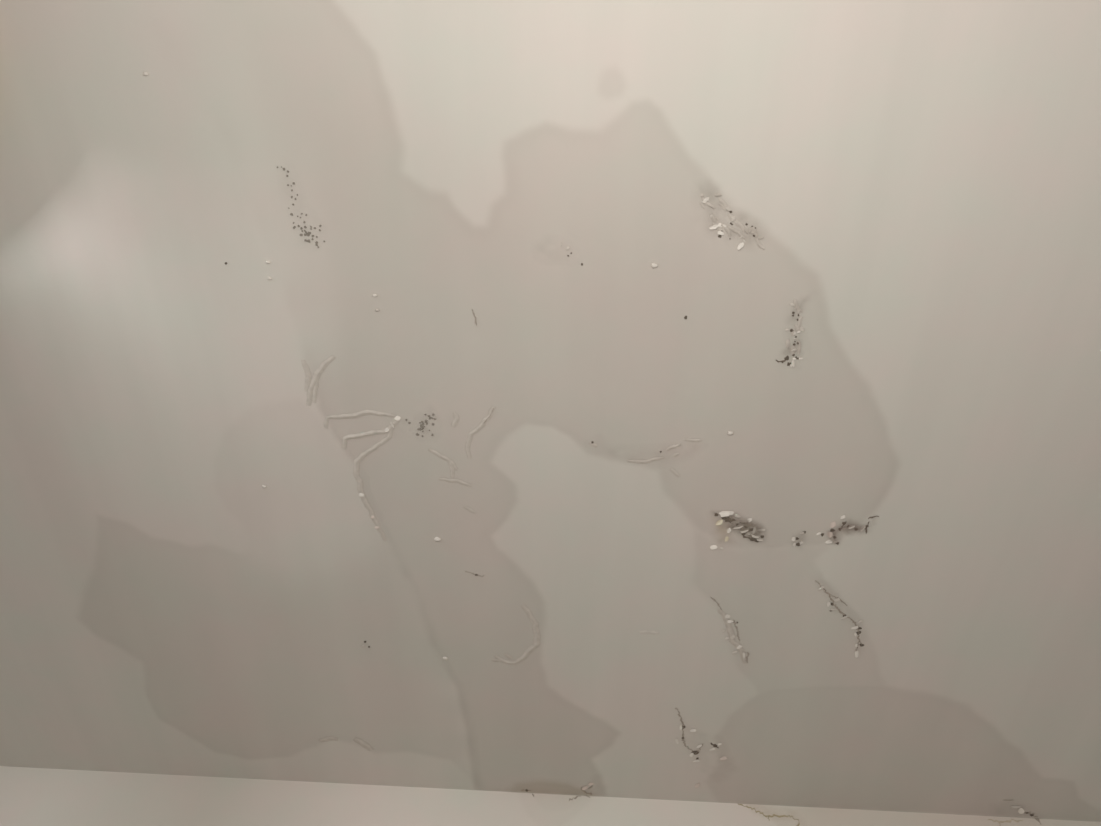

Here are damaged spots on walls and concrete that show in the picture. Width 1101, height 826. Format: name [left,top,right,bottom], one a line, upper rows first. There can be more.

leakage [277,166,325,248]
peeling [699,193,765,250]
peeling [776,299,804,368]
leakage [405,414,436,437]
spalling [710,511,765,550]
spalling [791,515,879,547]
crack [711,597,749,664]
crack [815,581,864,658]
crack [675,708,727,788]
crack [738,804,800,826]